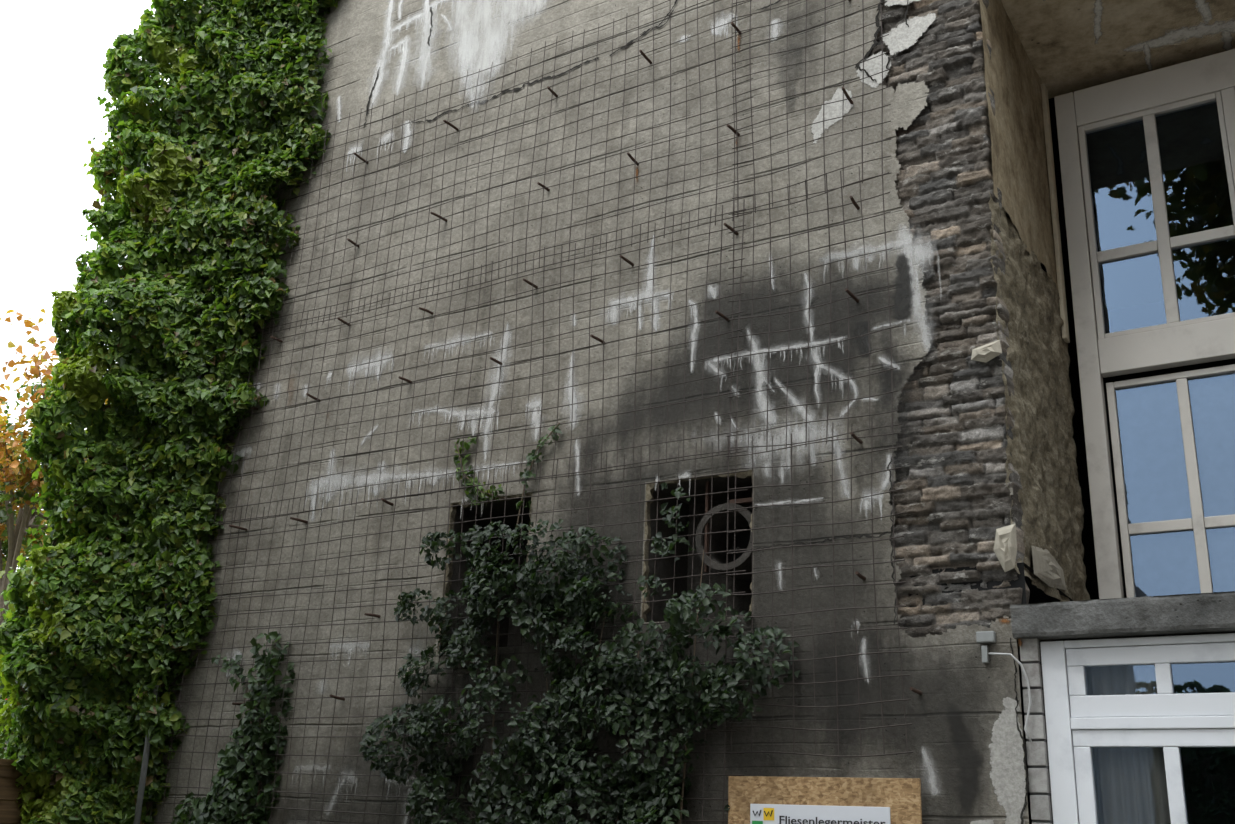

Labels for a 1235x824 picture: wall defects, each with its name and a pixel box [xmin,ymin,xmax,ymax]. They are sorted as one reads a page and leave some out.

crack [364,67,380,127]
leakage [371,0,543,106]
crack [412,0,677,123]
leakage [712,16,732,35]
spalling [810,0,1073,638]